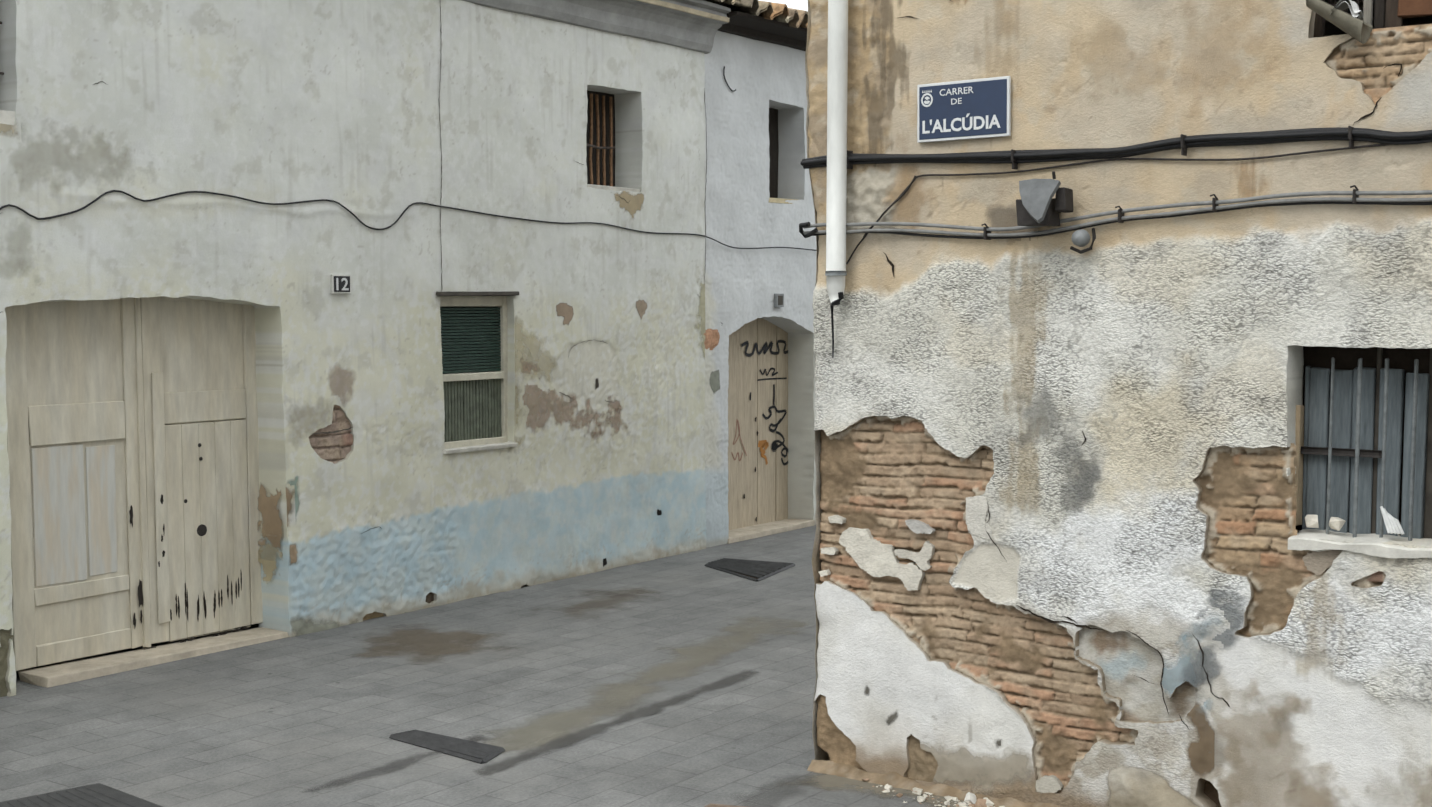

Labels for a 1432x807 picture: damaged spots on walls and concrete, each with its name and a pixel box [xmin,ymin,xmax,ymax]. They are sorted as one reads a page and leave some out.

flaking render [1324,24,1432,105]
flaking render [704,329,720,350]
flaking render [309,405,353,464]
peeling [257,484,297,581]
flaking render [1195,443,1343,637]
flaking render [816,416,1199,793]
flaking render [1352,571,1386,588]
flaking render [0,629,13,697]
spalling [1204,780,1222,807]